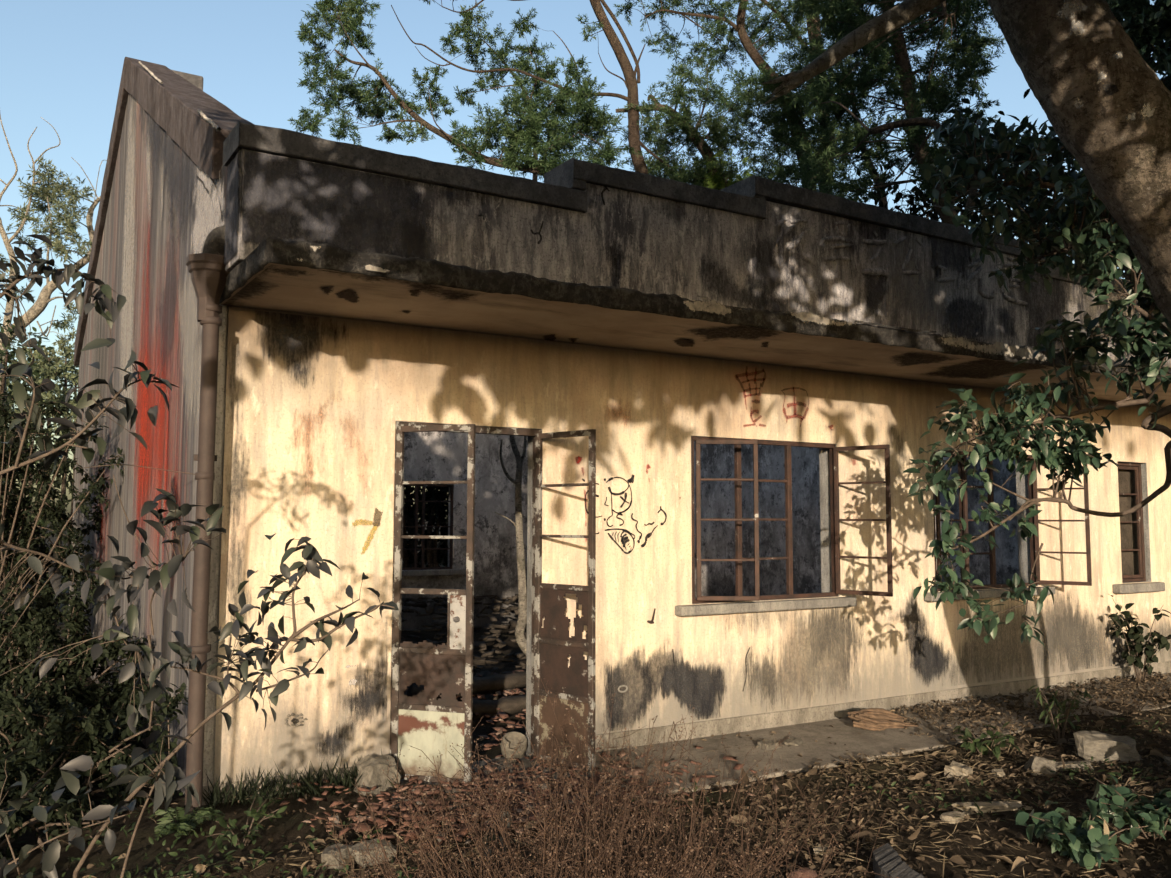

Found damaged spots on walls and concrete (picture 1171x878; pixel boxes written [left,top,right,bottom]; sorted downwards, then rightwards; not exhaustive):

water stain [224,268,306,305]
water stain [608,240,623,287]
water stain [865,236,1067,349]
water stain [257,311,346,384]
water stain [893,353,1050,379]
water stain [896,594,1126,683]
water stain [322,654,387,755]
water stain [606,647,724,728]